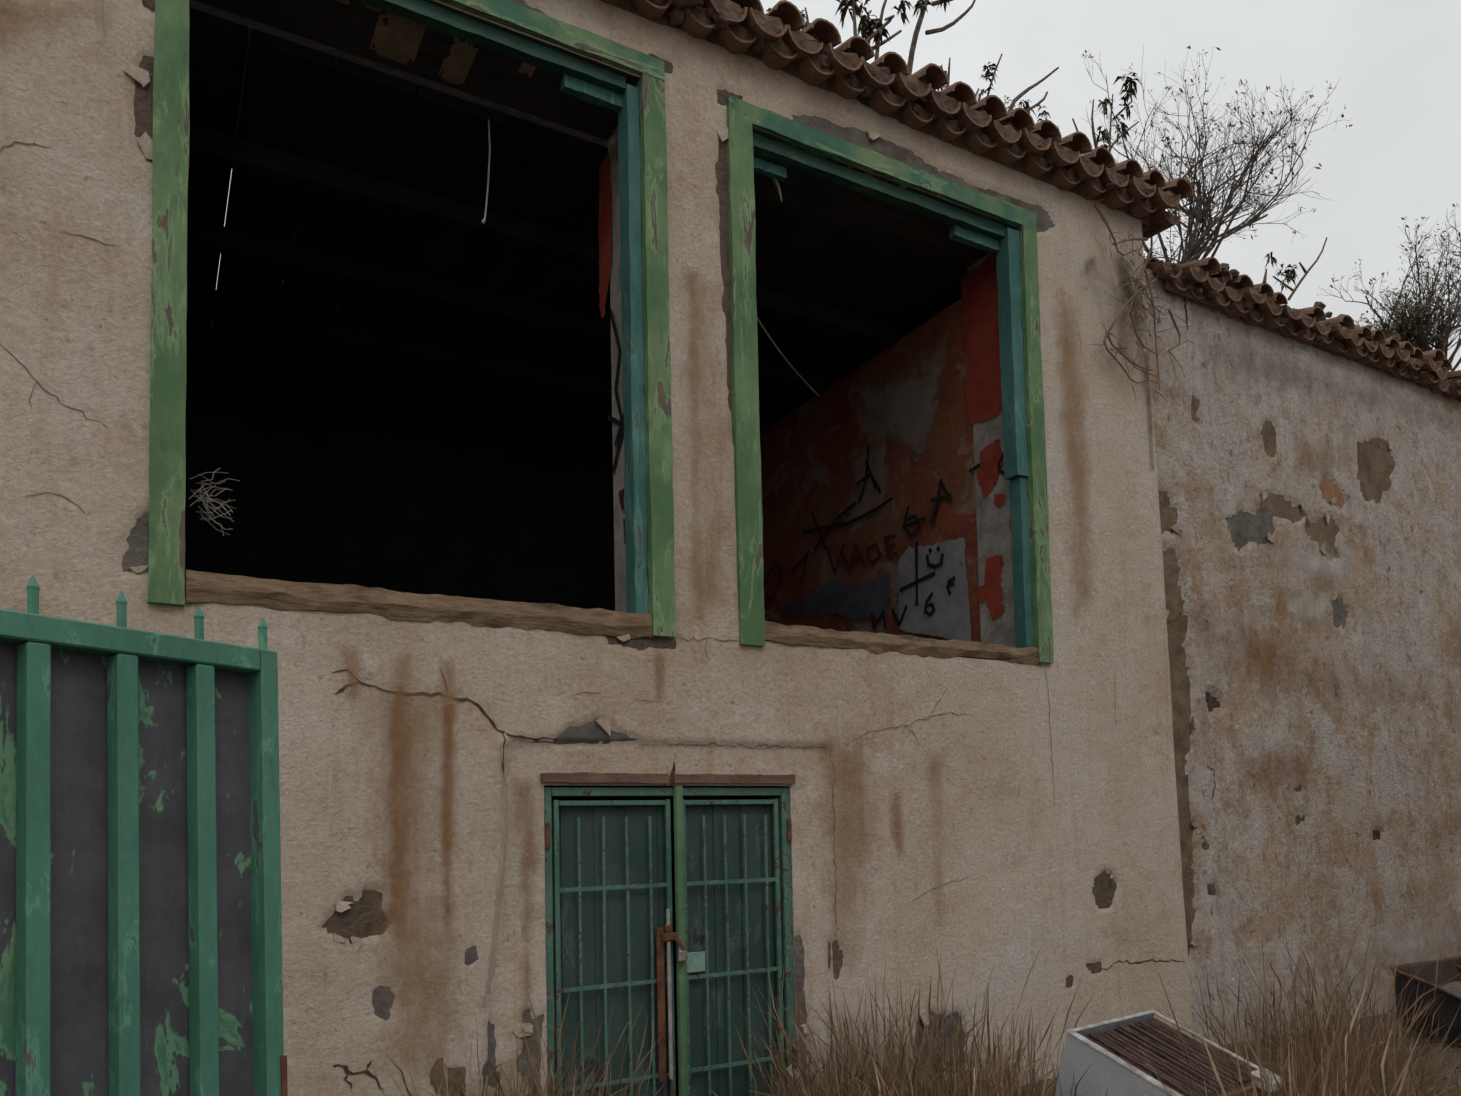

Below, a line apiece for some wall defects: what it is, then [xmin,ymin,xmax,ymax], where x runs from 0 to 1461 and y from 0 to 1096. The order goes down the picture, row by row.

spalling [123,55,154,161]
crack [0,141,52,152]
crack [0,344,108,428]
spalling [1357,438,1395,504]
spalling [1225,474,1344,561]
crack [332,668,555,780]
spalling [553,717,637,745]
spalling [1158,490,1220,956]
spalling [321,890,392,953]
spalling [1092,870,1117,909]
crack [1101,959,1184,970]
crack [333,1061,384,1091]